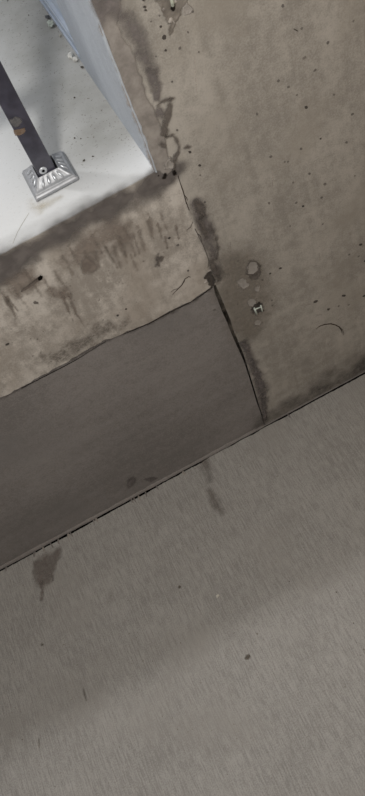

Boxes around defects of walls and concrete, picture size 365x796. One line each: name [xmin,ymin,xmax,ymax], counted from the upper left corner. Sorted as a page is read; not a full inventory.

crack [178,176,209,265]
water stain [191,198,267,422]
crack [0,276,365,571]